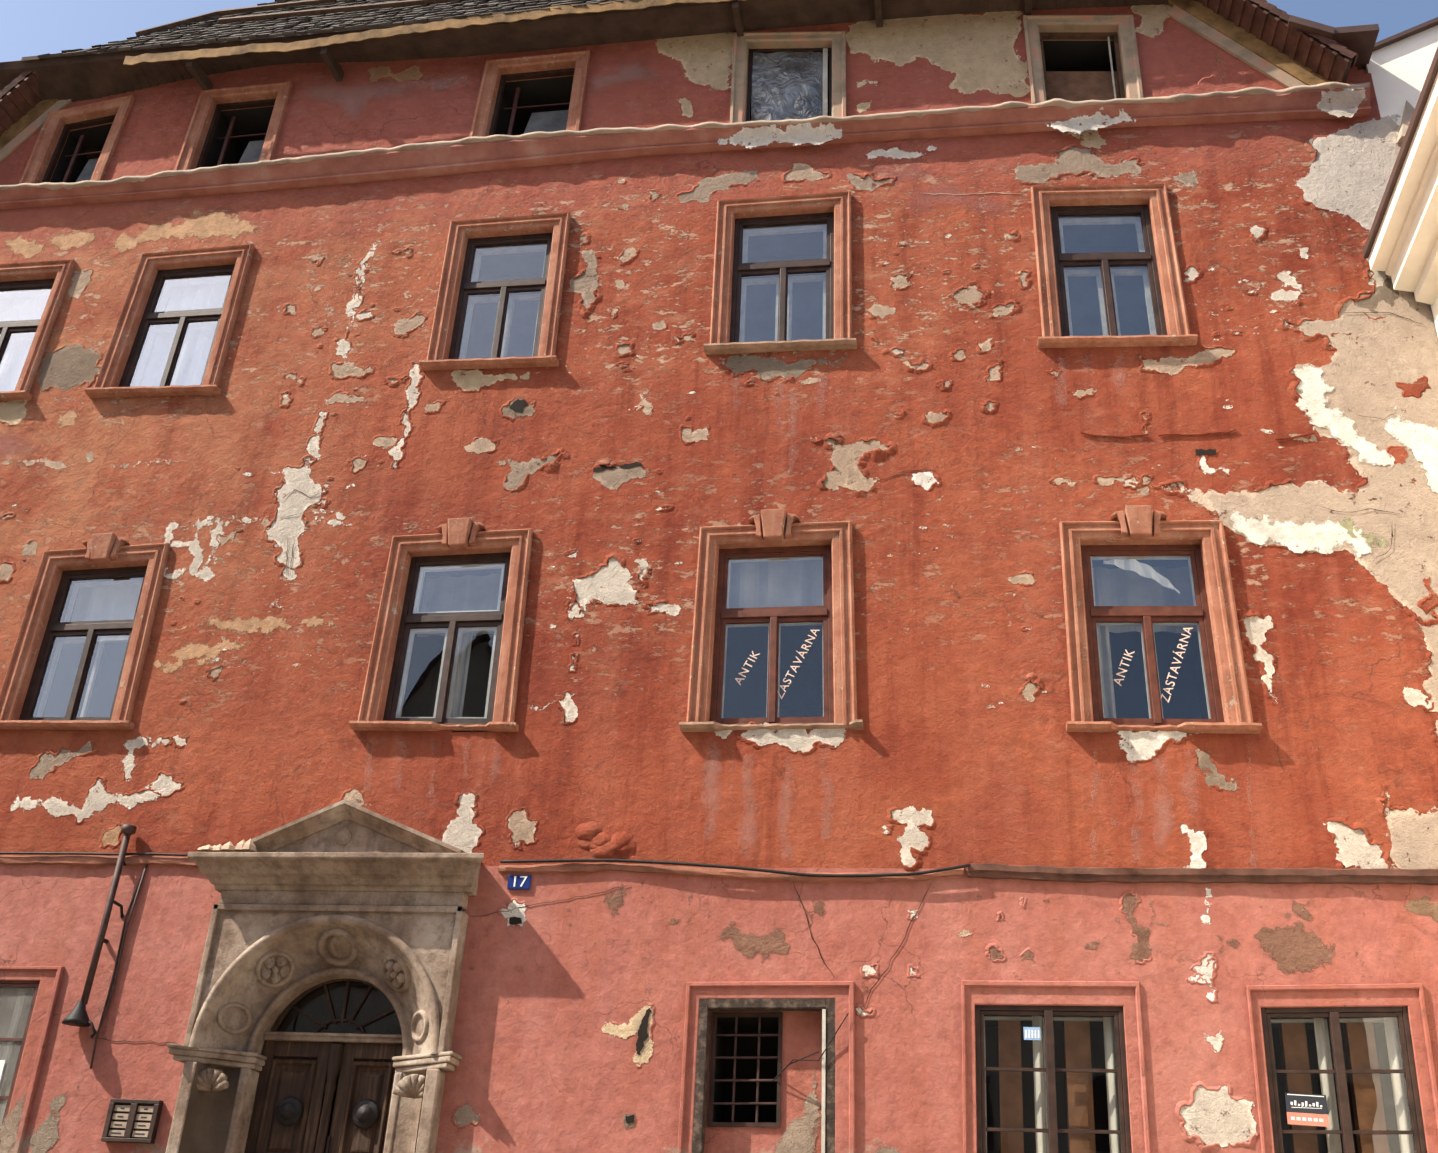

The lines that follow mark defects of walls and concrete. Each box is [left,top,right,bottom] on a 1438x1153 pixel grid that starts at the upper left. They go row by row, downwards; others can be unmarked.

spalling [846,11,1030,100]
spalling [718,122,937,192]
spalling [153,241,446,682]
spalling [1046,87,1438,748]
spalling [550,537,681,674]
spalling [10,733,190,849]
spalling [882,806,936,872]
spalling [1117,730,1239,792]
spalling [1323,784,1438,869]
crack [793,882,834,976]
crack [861,884,931,1013]
spalling [1175,1081,1259,1153]